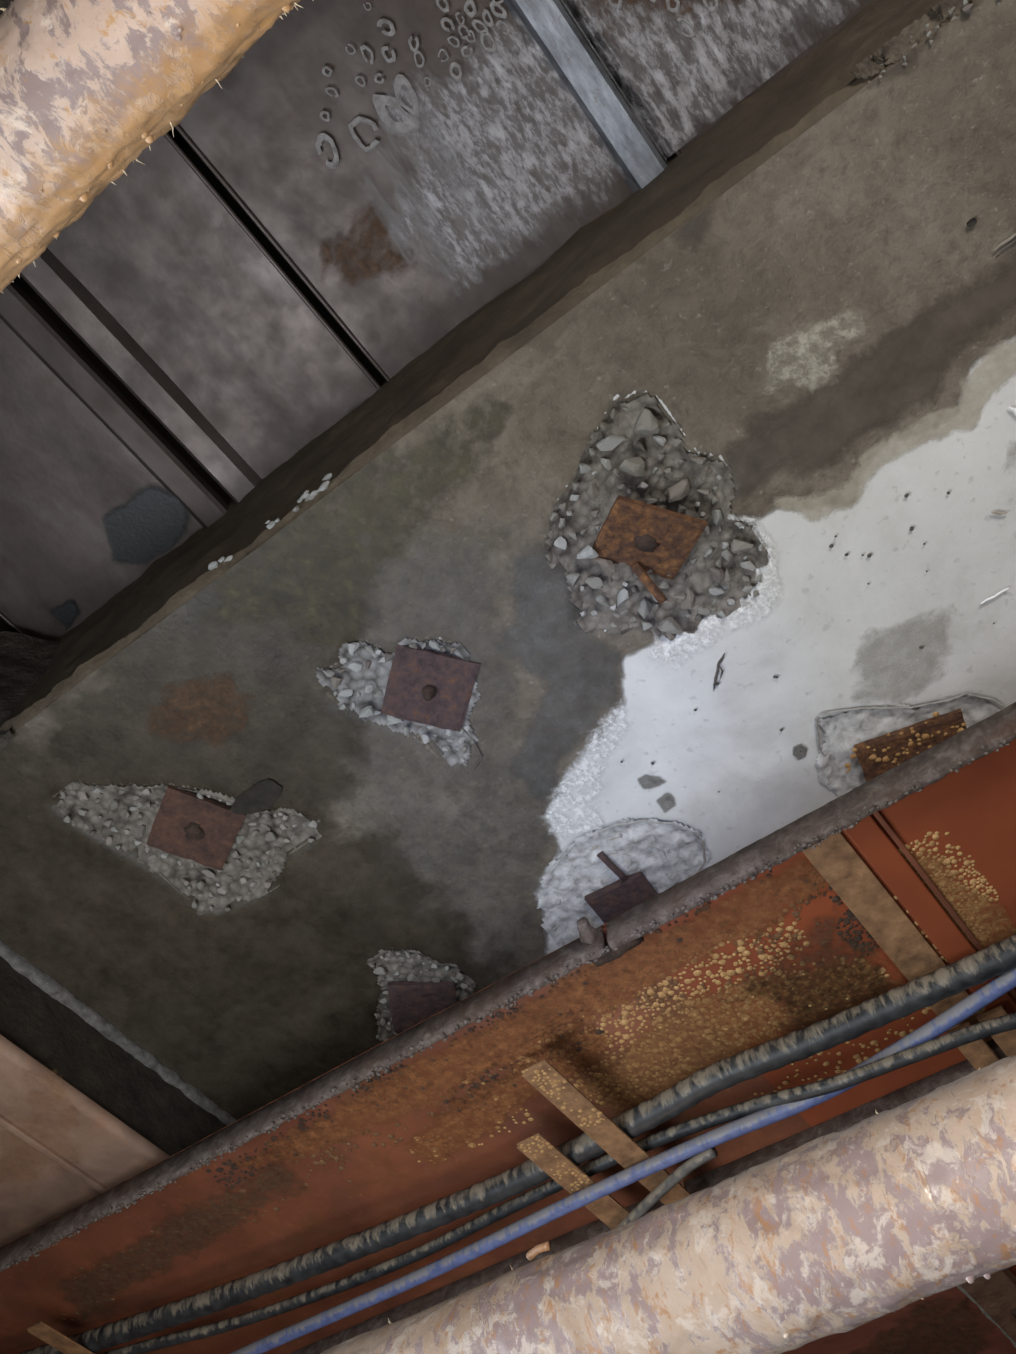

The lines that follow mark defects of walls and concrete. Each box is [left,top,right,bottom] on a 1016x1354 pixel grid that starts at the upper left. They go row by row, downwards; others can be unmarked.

damp [345,0,511,152]
damp [293,473,332,512]
spalling [545,393,771,639]
damp [648,608,724,662]
spalling [51,781,322,915]
spalling [316,638,481,767]
spalling [537,818,712,947]
damp [638,775,675,812]
spalling [800,692,1006,798]
corrosion [845,712,966,773]
corrosion [898,831,1016,951]
corrosion [754,1006,931,1095]